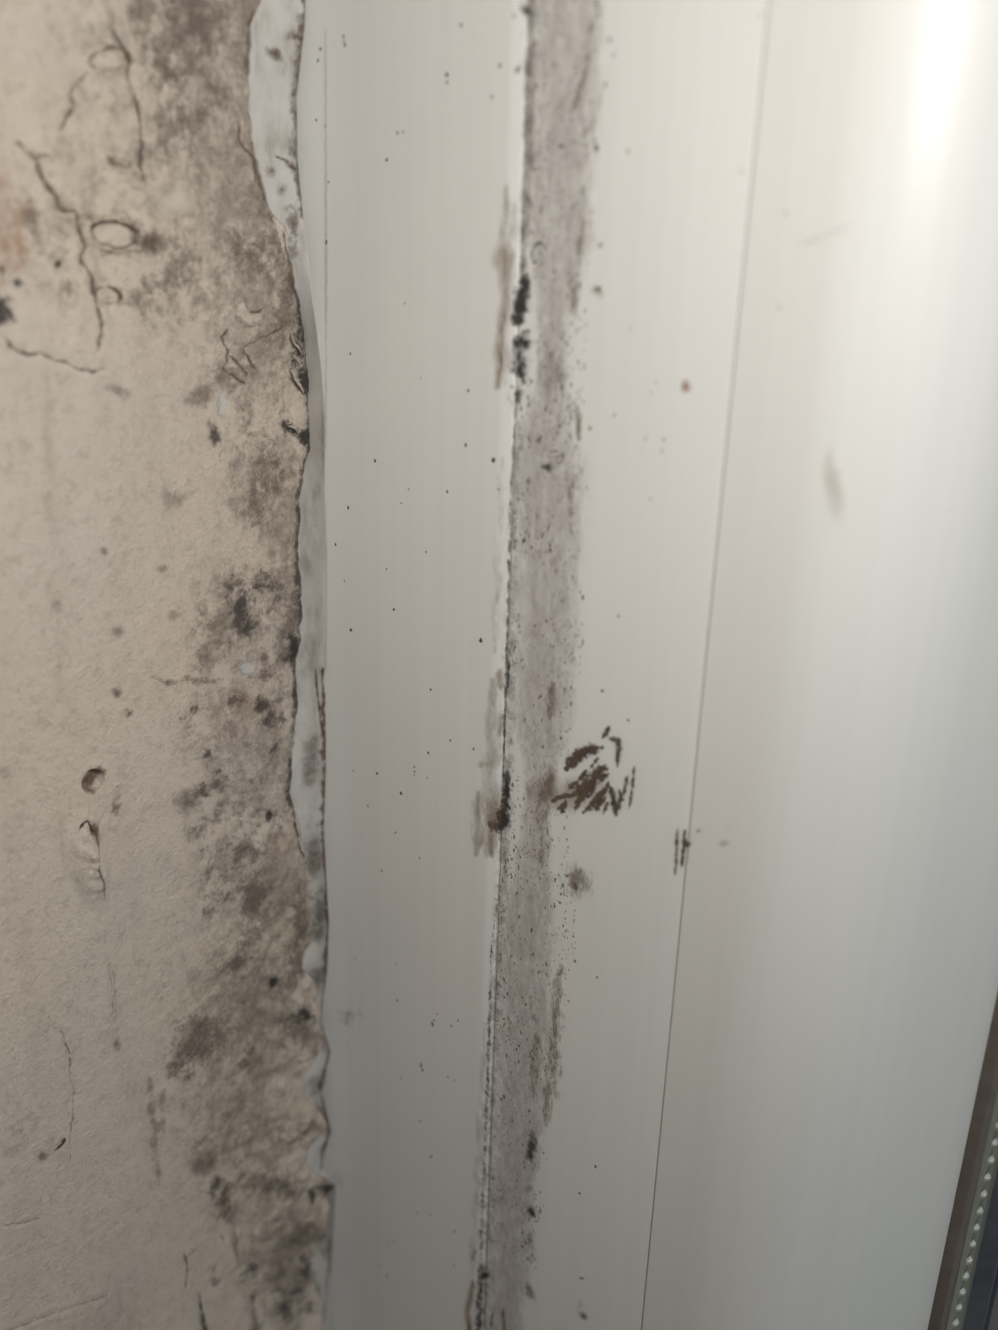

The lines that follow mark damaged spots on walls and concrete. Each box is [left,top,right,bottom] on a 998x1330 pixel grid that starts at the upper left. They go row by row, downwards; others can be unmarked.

crack [112,29,144,182]
water stain [0,265,24,324]
crack [8,73,103,373]
peeling [282,418,301,434]
peeling [288,329,306,395]
water stain [167,0,333,1204]
water stain [479,0,615,1271]
water stain [196,1097,258,1272]